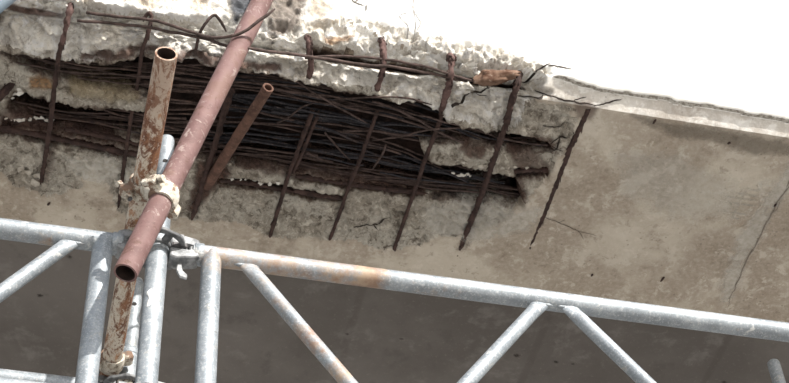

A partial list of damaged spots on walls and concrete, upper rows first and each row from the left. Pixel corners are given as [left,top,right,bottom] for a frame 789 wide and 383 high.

corrosion [6,4,61,17]
corrosion [0,98,139,152]
corrosion [81,45,158,62]
spalling [0,0,244,198]
corrosion [177,50,221,66]
corrosion [240,61,280,71]
spalling [172,0,579,251]
crack [543,122,568,151]
crack [517,63,621,106]
corrosion [188,134,410,211]
corrosion [506,133,551,198]
crack [729,182,789,303]